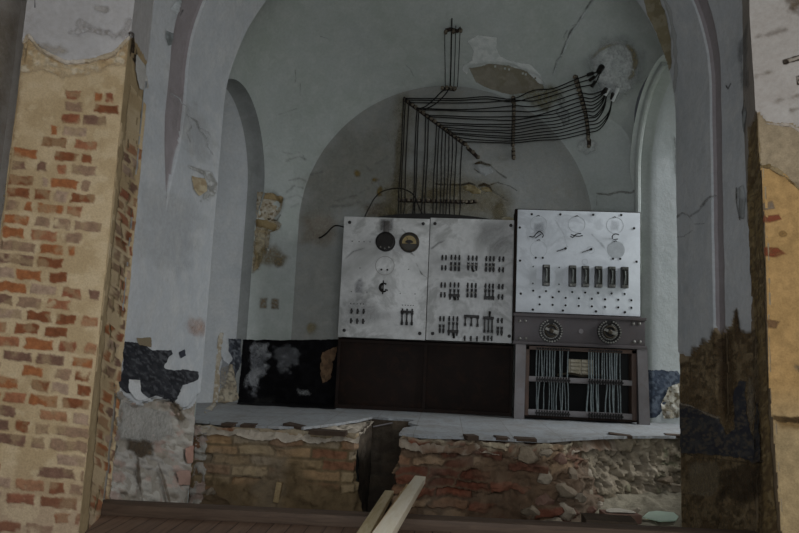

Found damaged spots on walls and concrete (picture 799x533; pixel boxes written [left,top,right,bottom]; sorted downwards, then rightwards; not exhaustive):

spalling [462,35,564,111]
spalling [644,0,678,92]
spalling [0,19,363,533]
spalling [648,104,799,533]
spalling [391,434,682,527]